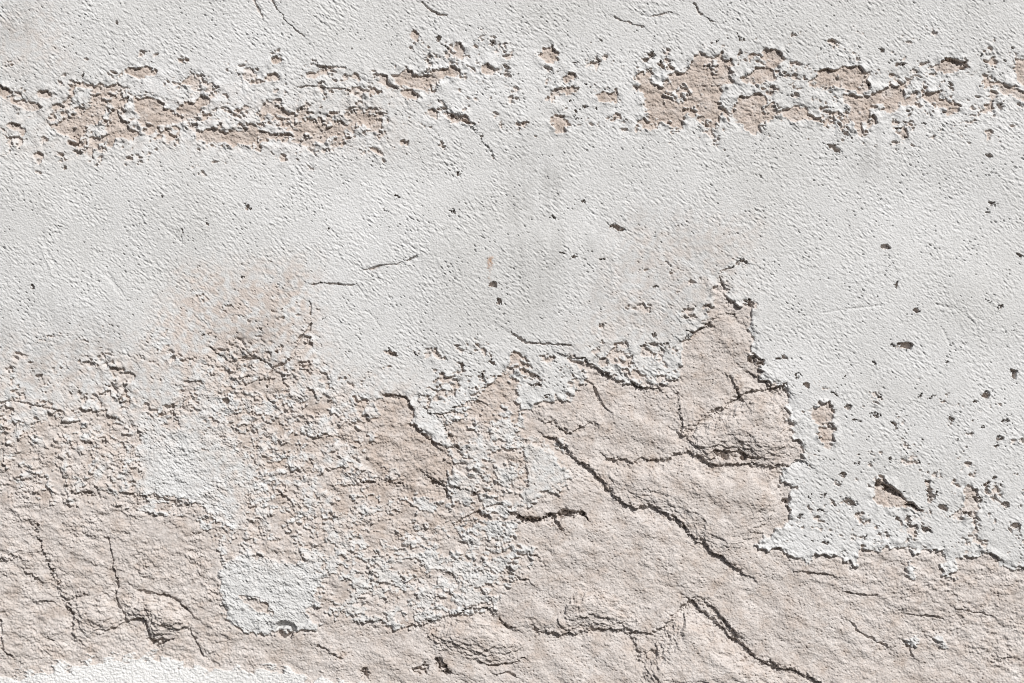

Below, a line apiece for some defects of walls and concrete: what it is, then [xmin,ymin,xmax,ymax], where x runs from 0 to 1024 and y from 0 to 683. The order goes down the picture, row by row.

peeling [0,36,519,163]
peeling [538,45,622,134]
peeling [633,33,971,155]
peeling [980,47,1024,114]
peeling [0,283,1024,683]
crack [510,331,804,574]
crack [0,523,88,642]
crack [106,537,204,657]
crack [510,554,545,581]
crack [407,597,822,683]